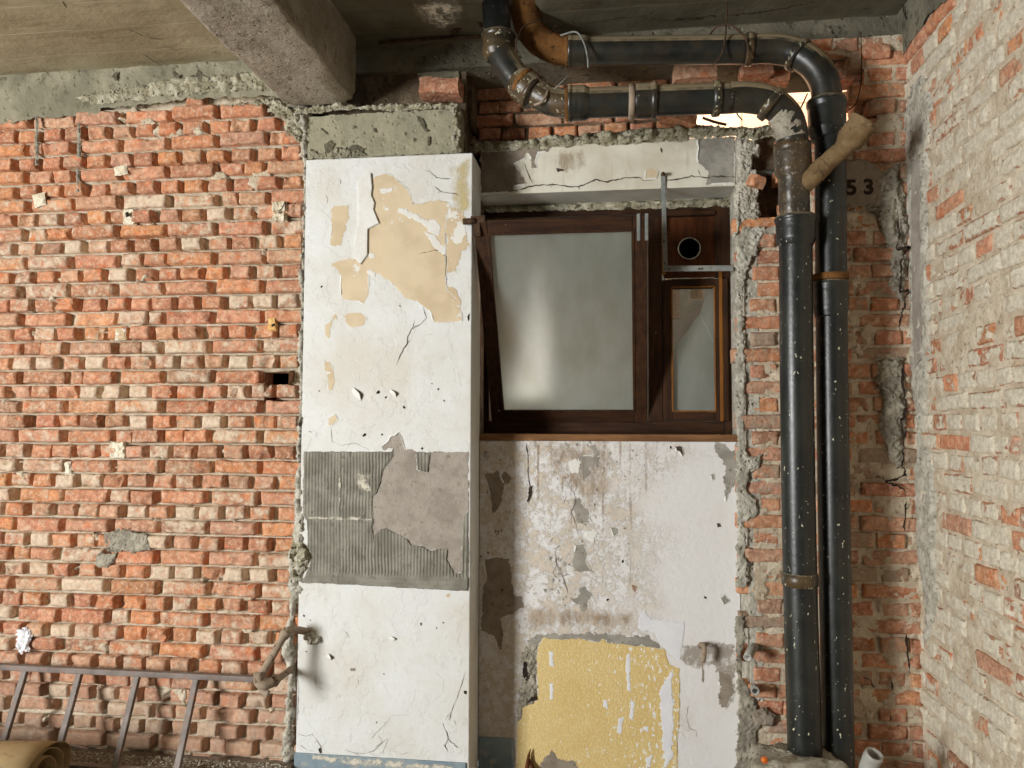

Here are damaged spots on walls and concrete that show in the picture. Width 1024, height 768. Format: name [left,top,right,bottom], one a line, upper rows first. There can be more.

crack [494,165,736,194]
crack [870,205,911,331]
spalling [75,69,776,768]
crack [882,358,908,531]